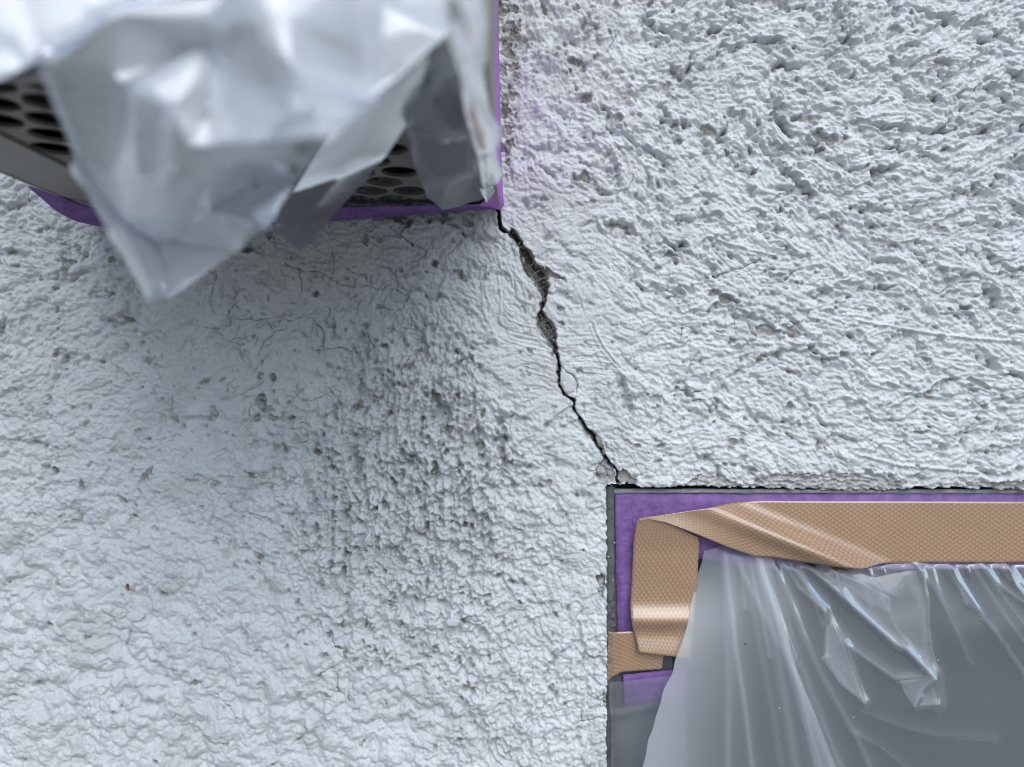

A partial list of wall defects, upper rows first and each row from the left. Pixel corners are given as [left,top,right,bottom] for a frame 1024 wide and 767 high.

crack [496,210,621,483]